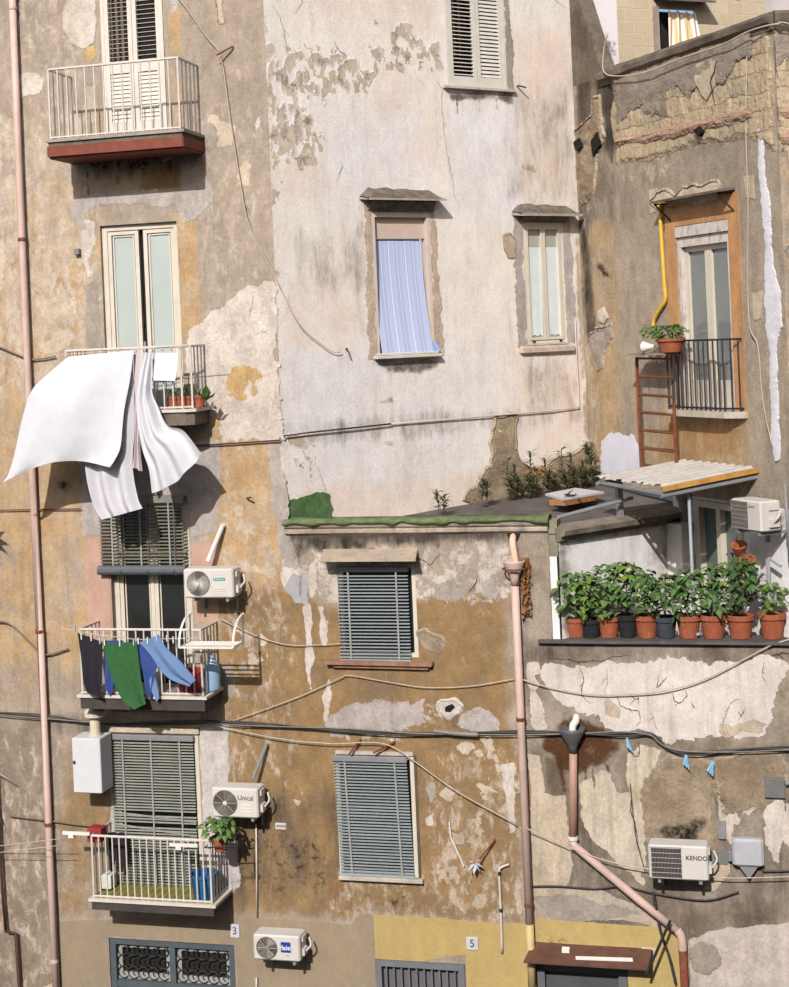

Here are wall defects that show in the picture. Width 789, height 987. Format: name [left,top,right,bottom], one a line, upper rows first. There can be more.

flaking render [255,21,444,171]
flaking render [573,29,789,206]
peeling [185,280,318,484]
flaking render [462,412,589,504]
peeling [425,782,462,826]
flaking render [436,697,481,721]
peeling [437,865,487,914]
peeling [446,736,516,846]
corrosion [543,719,617,786]
peeling [502,753,665,928]
peeling [526,654,789,891]